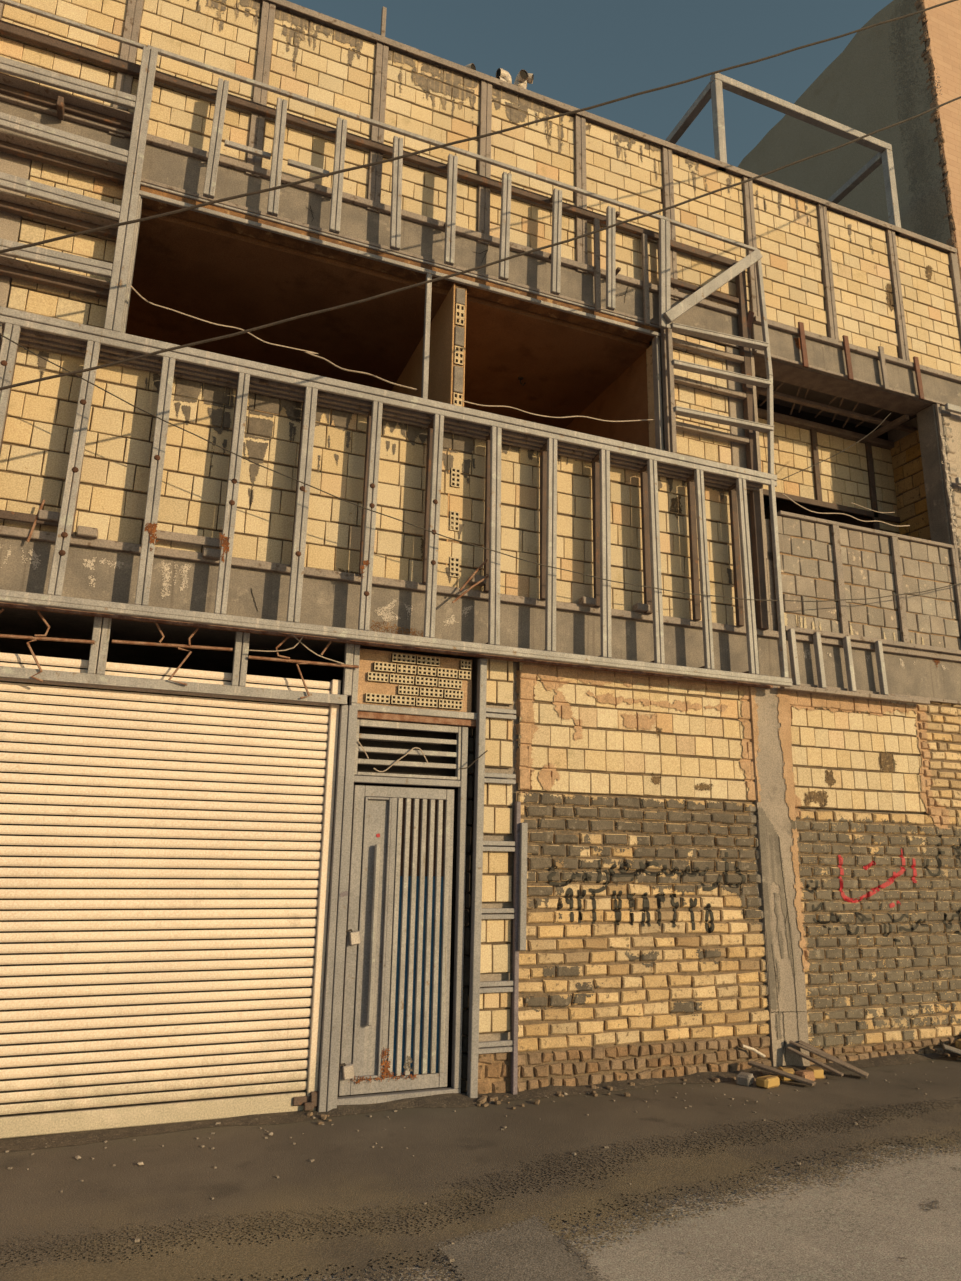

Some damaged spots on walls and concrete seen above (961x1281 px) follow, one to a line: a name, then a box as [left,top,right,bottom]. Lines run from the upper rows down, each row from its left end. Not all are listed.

damp [188,0,364,71]
damp [388,48,591,155]
damp [613,134,661,180]
damp [755,190,809,233]
damp [145,373,354,506]
spalling [878,751,897,773]
spalling [801,770,836,811]
corrosion [353,1047,418,1084]